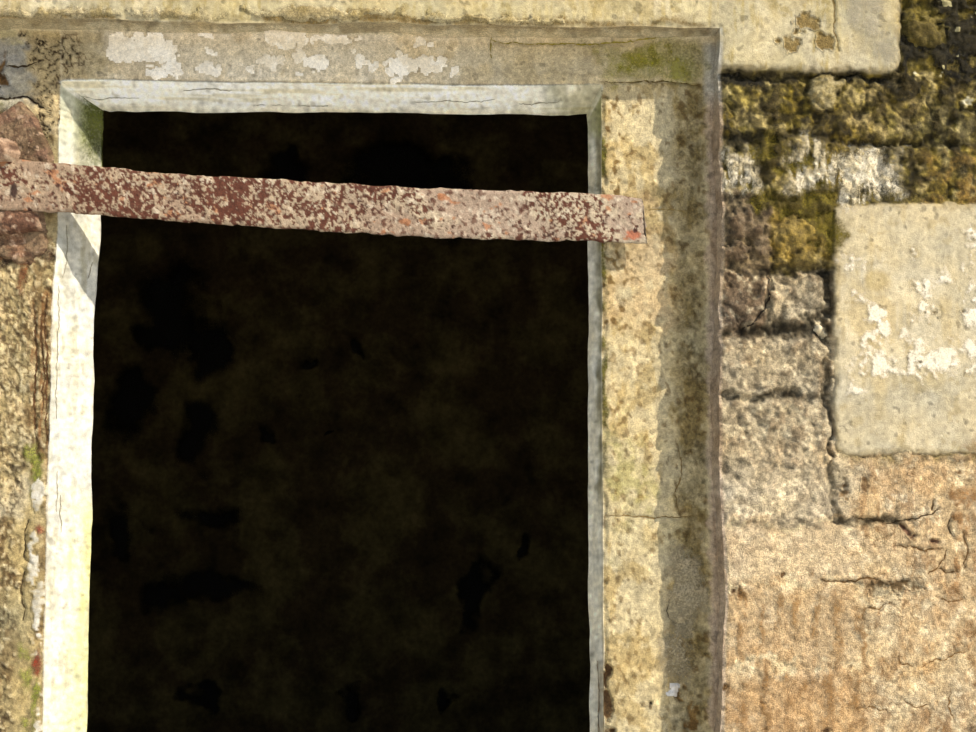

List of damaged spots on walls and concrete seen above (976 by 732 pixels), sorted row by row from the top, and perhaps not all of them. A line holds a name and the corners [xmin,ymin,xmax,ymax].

corrosion [0,229,56,292]
crack [742,269,771,329]
crack [856,501,969,574]
crack [821,576,890,619]
crack [898,634,975,668]
crack [857,690,954,719]